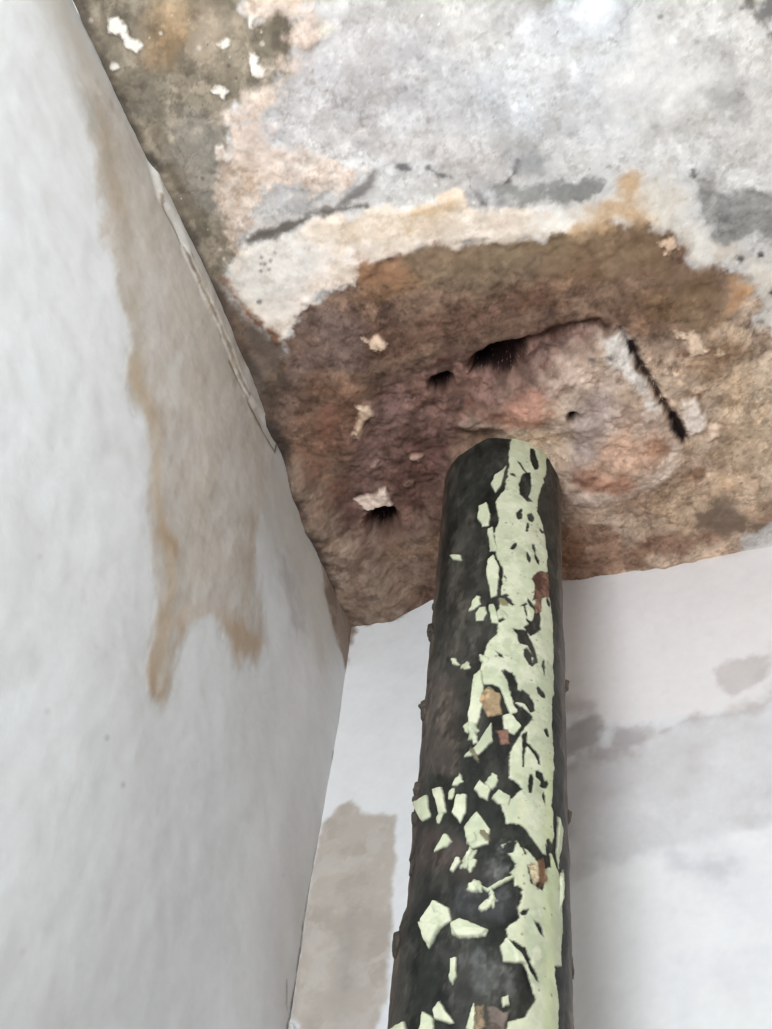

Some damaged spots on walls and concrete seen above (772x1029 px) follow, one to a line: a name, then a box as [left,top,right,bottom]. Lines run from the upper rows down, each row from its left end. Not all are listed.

peeling [215,0,772,337]
damp [591,146,772,325]
damp [72,0,371,718]
crack [461,351,479,369]
spalling [333,314,613,559]
peeling [468,465,509,624]
rust [219,163,772,615]
crack [523,316,691,447]
damp [290,796,400,1029]
peeling [413,773,515,950]
peeling [450,654,522,763]
damp [565,639,772,891]